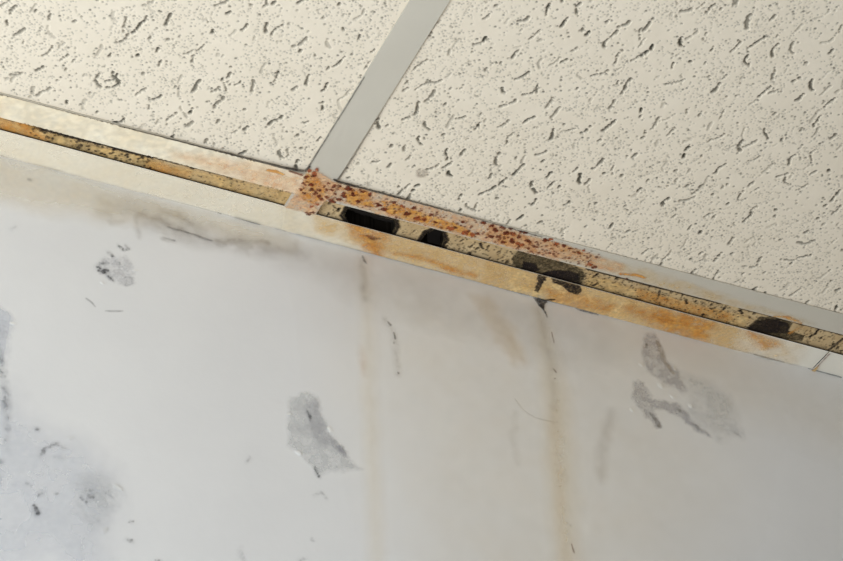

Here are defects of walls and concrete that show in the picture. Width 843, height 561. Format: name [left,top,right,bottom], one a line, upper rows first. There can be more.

corrosion [287,168,645,279]
corrosion [351,225,736,348]